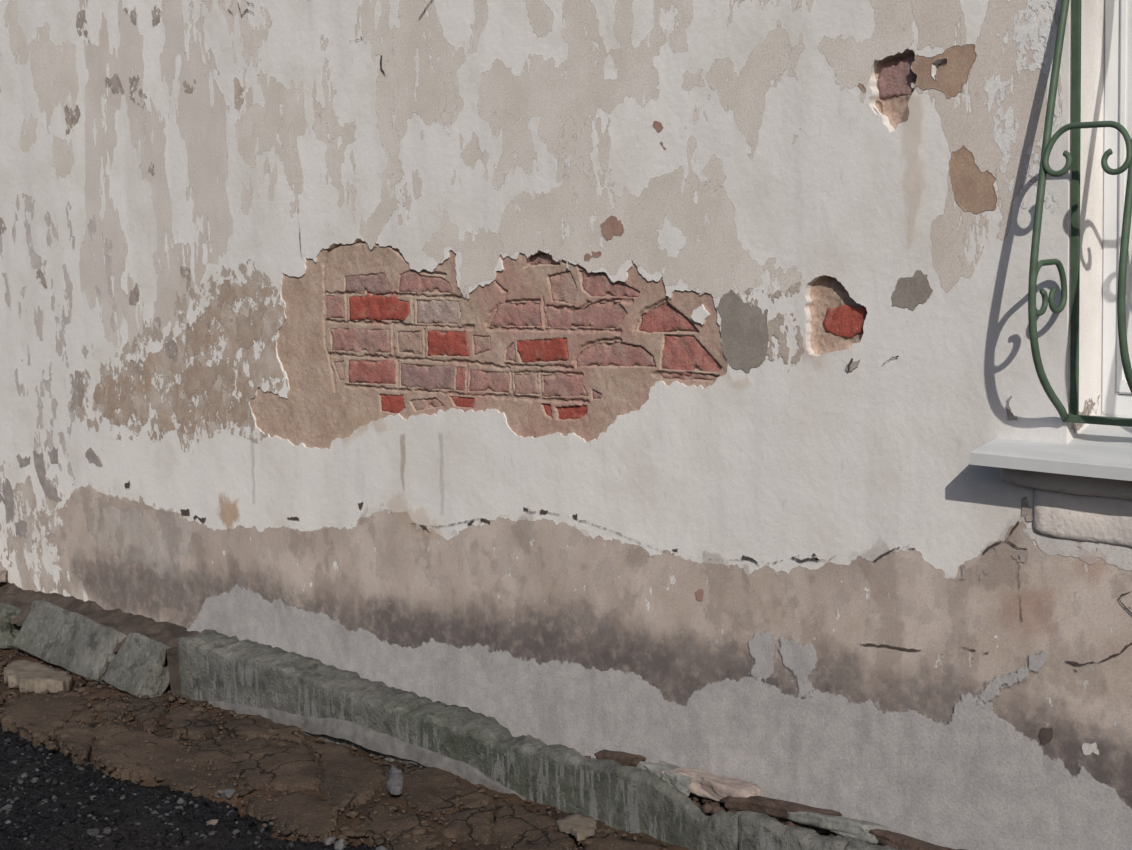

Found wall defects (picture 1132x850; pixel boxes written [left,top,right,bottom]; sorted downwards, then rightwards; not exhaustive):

peeling [4,0,79,179]
peeling [817,0,1063,310]
peeling [12,193,73,369]
flaking render [58,0,813,457]
flaking render [766,275,867,371]
peeling [31,362,58,456]
damp [87,568,794,706]
flaking render [0,462,1132,808]
damp [856,686,957,725]
crack [863,643,988,659]
damp [996,714,1132,809]
crack [1065,642,1132,672]